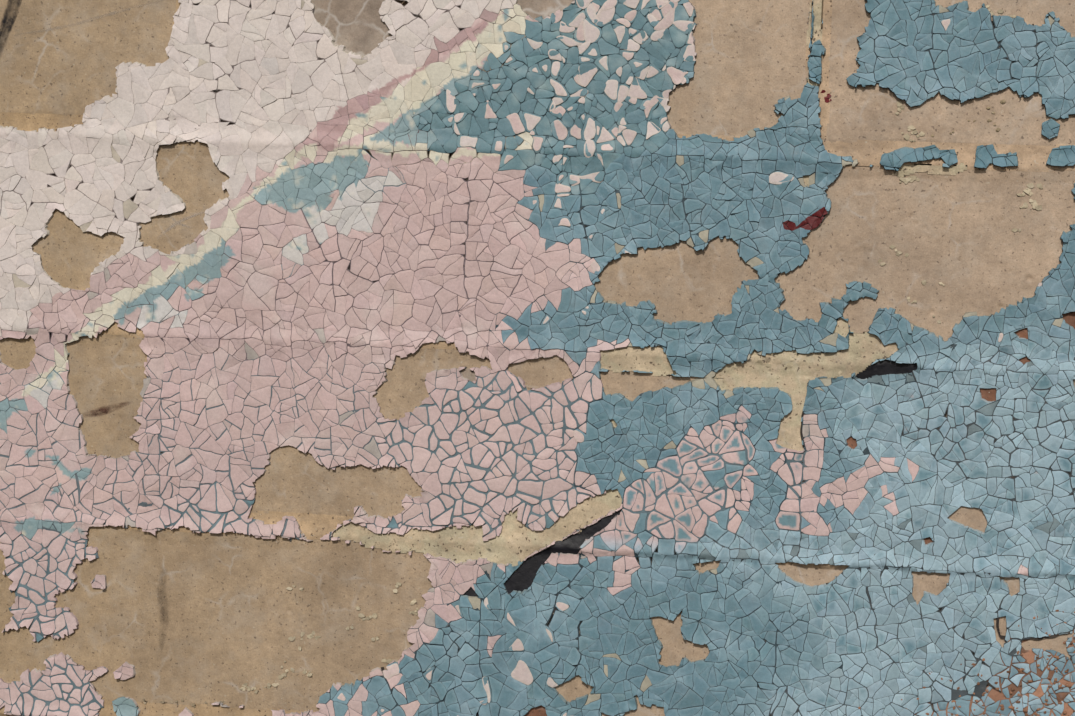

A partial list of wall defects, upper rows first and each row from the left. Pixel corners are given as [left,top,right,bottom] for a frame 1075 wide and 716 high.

peeling [1041,421,1075,476]
crack [797,411,805,553]
peeling [224,520,248,534]
peeling [941,607,954,628]
crack [996,608,1070,640]
peeling [377,694,396,710]
peeling [400,700,420,716]
peeling [918,688,931,704]
peeling [914,705,937,716]
peeling [932,681,971,716]
peeling [970,686,1015,716]
peeling [990,662,1075,716]